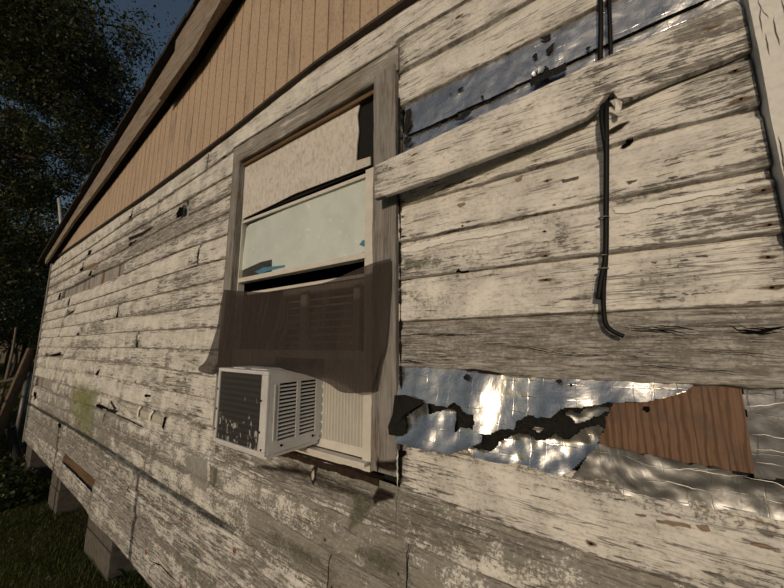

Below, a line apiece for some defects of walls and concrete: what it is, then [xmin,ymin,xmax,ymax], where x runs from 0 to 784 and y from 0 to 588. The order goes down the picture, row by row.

crack [758,0,784,54]
crack [398,333,601,357]
crack [625,325,784,379]
peeling [565,406,609,423]
peeling [656,512,710,532]